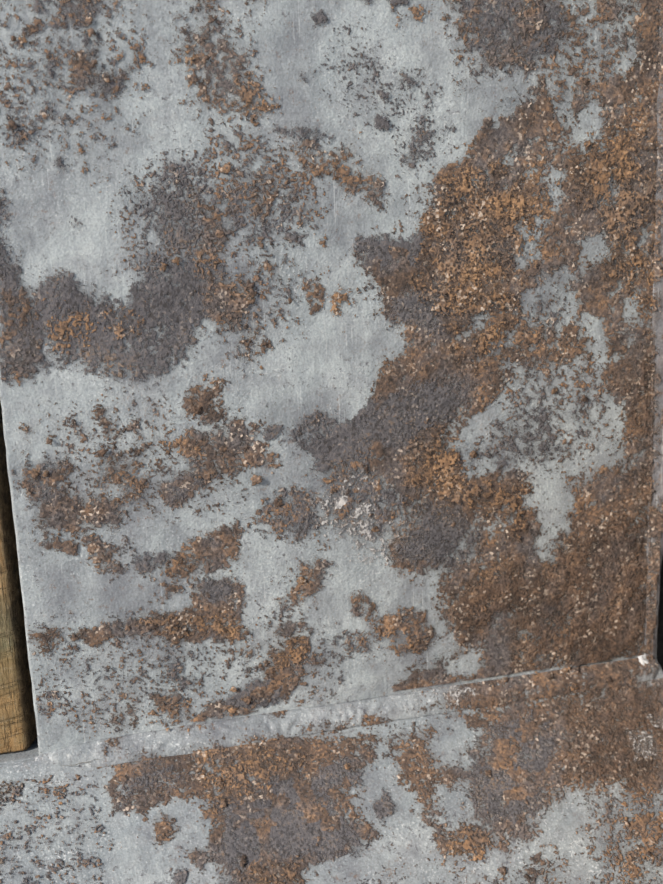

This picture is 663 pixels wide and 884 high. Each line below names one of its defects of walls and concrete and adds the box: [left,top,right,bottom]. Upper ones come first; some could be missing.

corrosion [0,187,21,279]
corrosion [0,769,113,884]